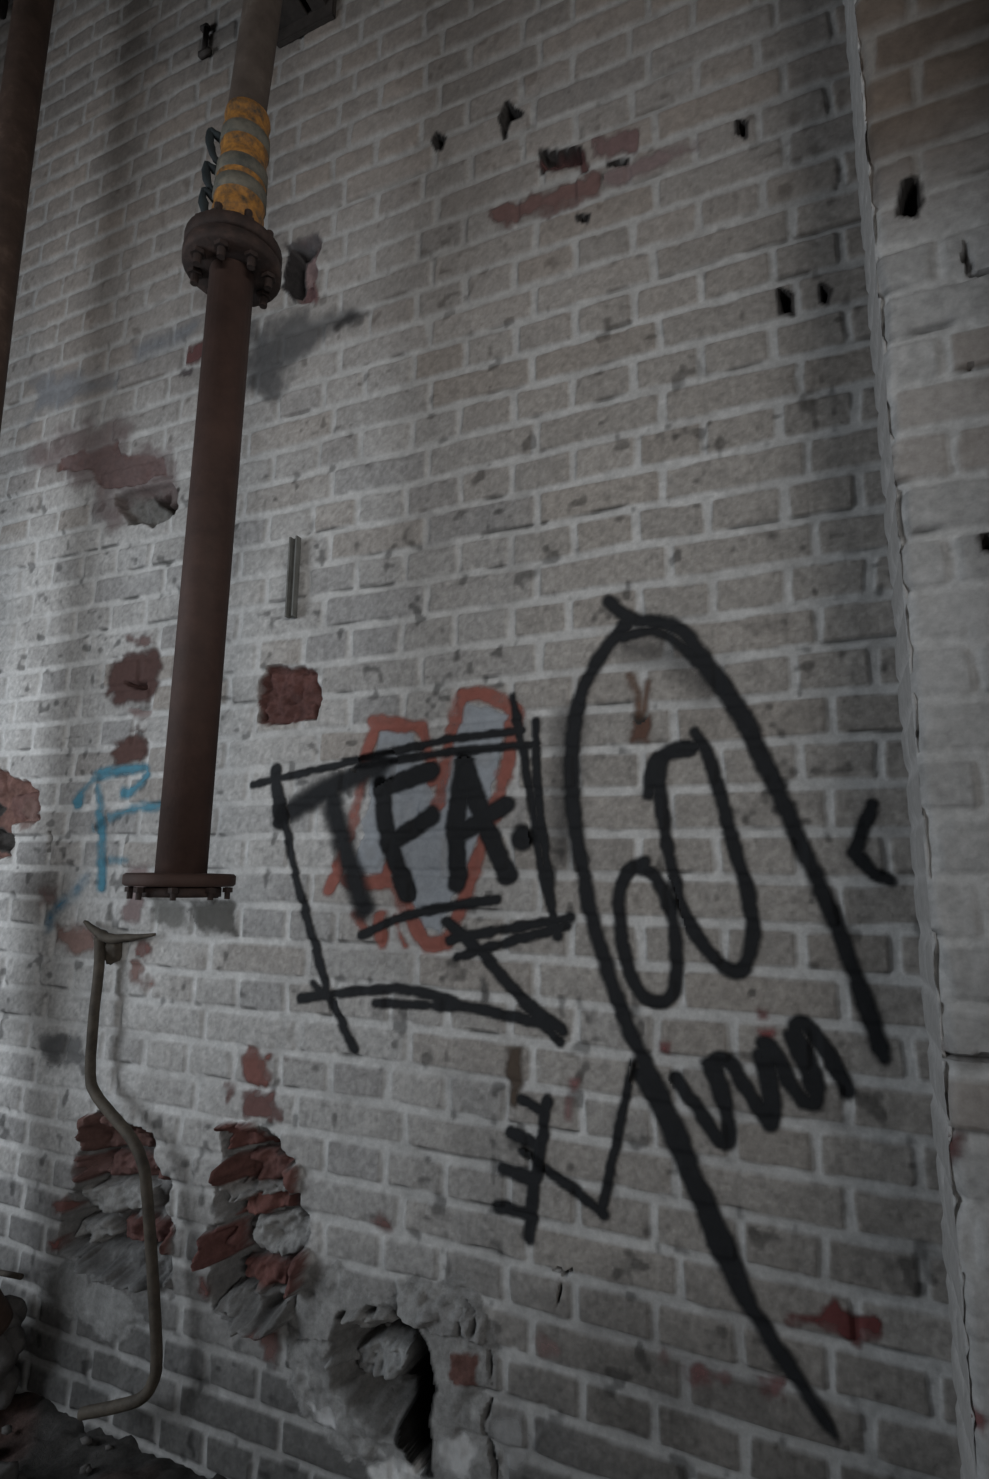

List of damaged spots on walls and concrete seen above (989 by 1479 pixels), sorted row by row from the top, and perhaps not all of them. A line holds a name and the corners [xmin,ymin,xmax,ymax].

spalling [499,101,522,137]
peeling [489,129,683,227]
spalling [56,438,179,529]
spalling [256,663,323,728]
spalling [0,766,53,859]
spalling [49,1110,178,1302]
spalling [191,1046,503,1479]